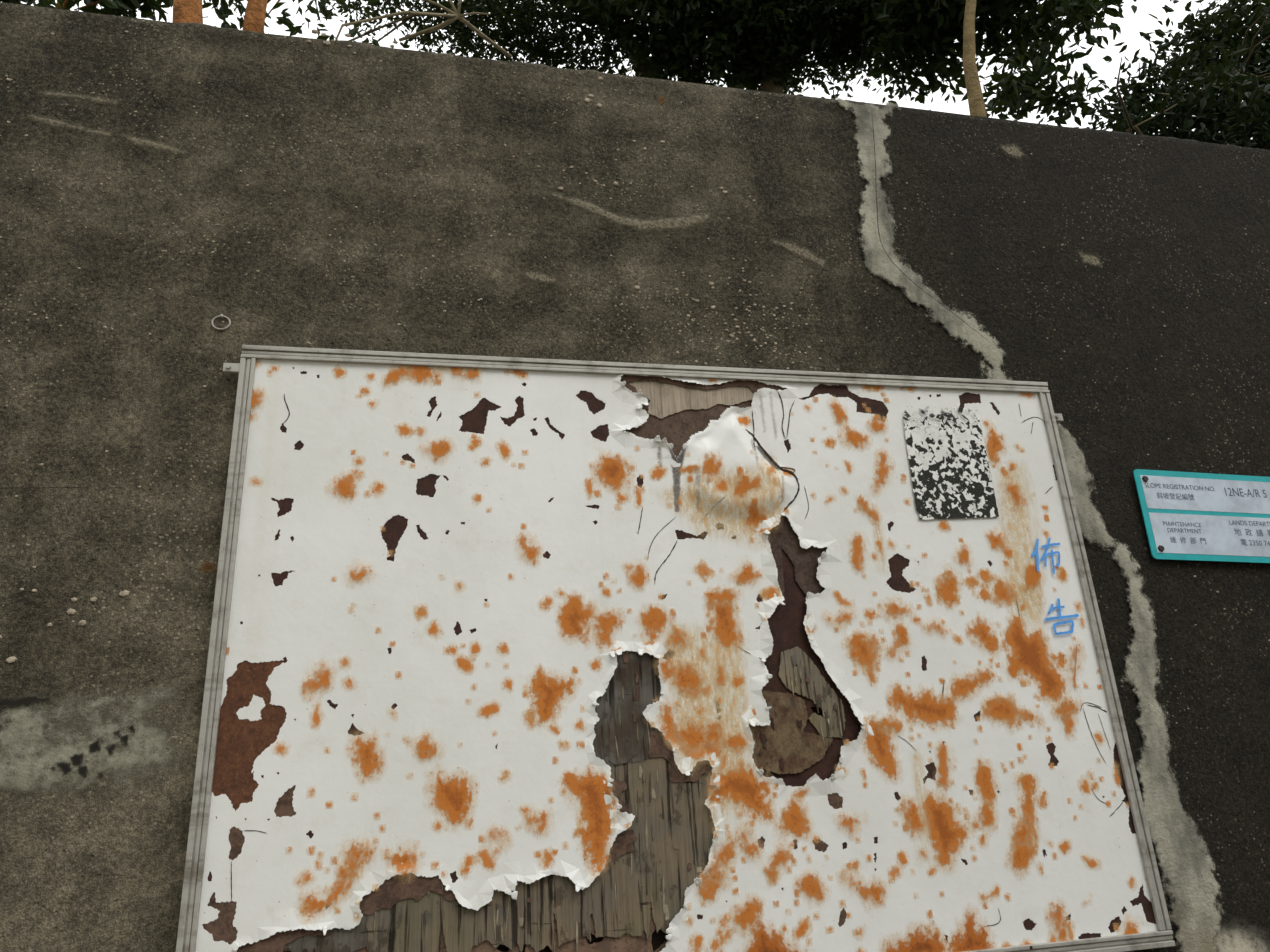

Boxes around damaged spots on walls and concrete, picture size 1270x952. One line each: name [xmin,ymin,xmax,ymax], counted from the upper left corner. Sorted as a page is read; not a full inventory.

corrosion [360,366,479,407]
corrosion [620,375,787,393]
corrosion [397,425,451,461]
peeling [654,435,687,450]
corrosion [805,386,906,521]
corrosion [984,421,1026,510]
crack [832,97,1270,952]
peeling [212,657,296,860]
peeling [348,714,364,736]
corrosion [404,732,509,875]
peeling [202,871,239,952]
corrosion [237,814,456,952]